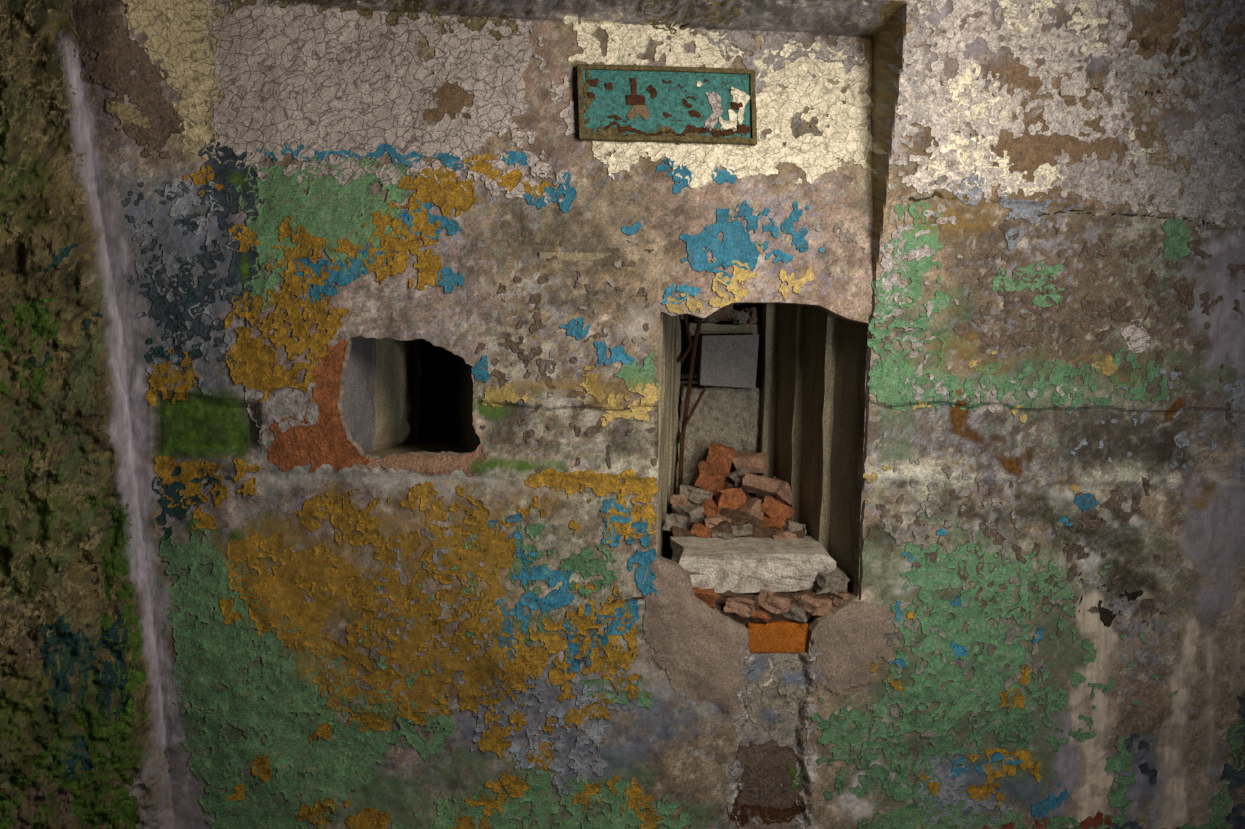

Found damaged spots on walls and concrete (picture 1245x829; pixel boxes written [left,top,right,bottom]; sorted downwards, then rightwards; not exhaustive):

leakage [0,0,691,829]
peeling [0,0,703,829]
peeling [557,0,1245,495]
peeling [727,364,1245,829]
leakage [1030,493,1245,829]
leakage [1196,234,1245,370]